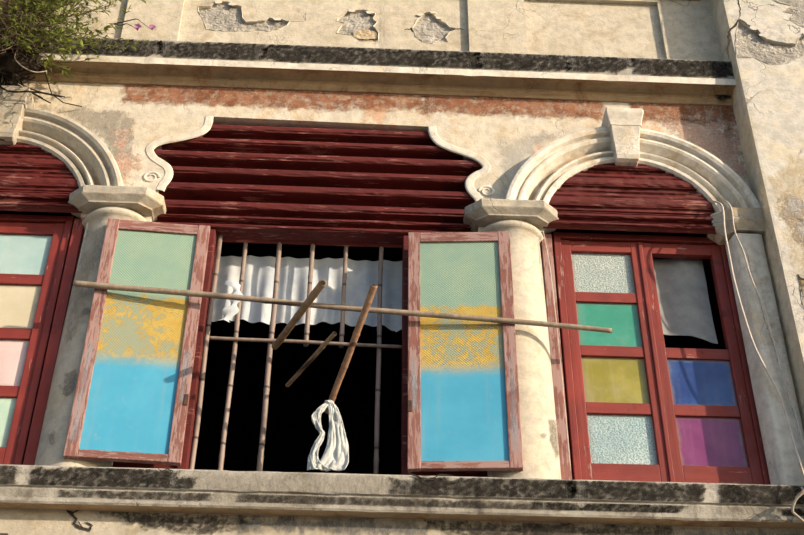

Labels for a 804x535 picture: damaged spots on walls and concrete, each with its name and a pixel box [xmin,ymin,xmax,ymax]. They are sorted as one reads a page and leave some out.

spalling [197,0,290,32]
spalling [336,9,379,42]
spalling [405,11,463,44]
spalling [735,0,804,65]
damp [30,37,734,78]
damp [0,465,17,484]
damp [30,466,706,513]
damp [718,484,804,516]
crack [67,510,93,532]
damp [100,511,798,535]